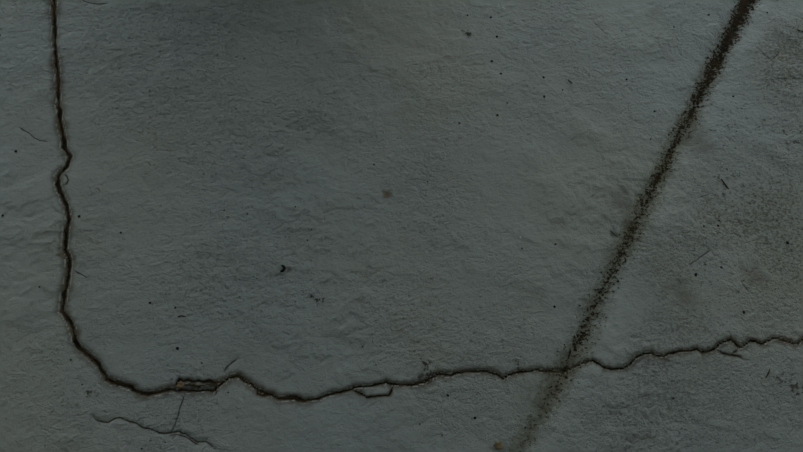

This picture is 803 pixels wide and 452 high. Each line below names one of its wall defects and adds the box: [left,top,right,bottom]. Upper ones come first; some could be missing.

crack [49,0,72,190]
crack [57,187,803,403]
crack [94,397,209,445]